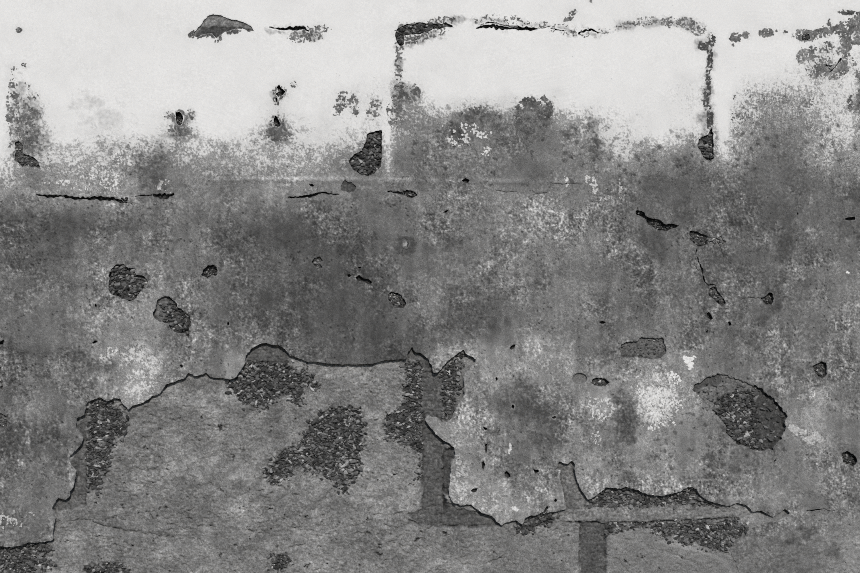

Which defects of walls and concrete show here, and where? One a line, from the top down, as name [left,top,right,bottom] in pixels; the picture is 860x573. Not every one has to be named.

flaking render [188,14,254,43]
flaking render [333,16,456,193]
peeling [437,94,554,155]
peeling [475,9,716,161]
peeling [729,9,860,123]
crack [35,193,174,205]
flaking render [636,209,727,248]
flaking render [108,264,148,301]
crack [694,246,717,290]
flaking render [152,295,192,338]
flaking render [619,336,668,360]
spalling [0,342,807,573]